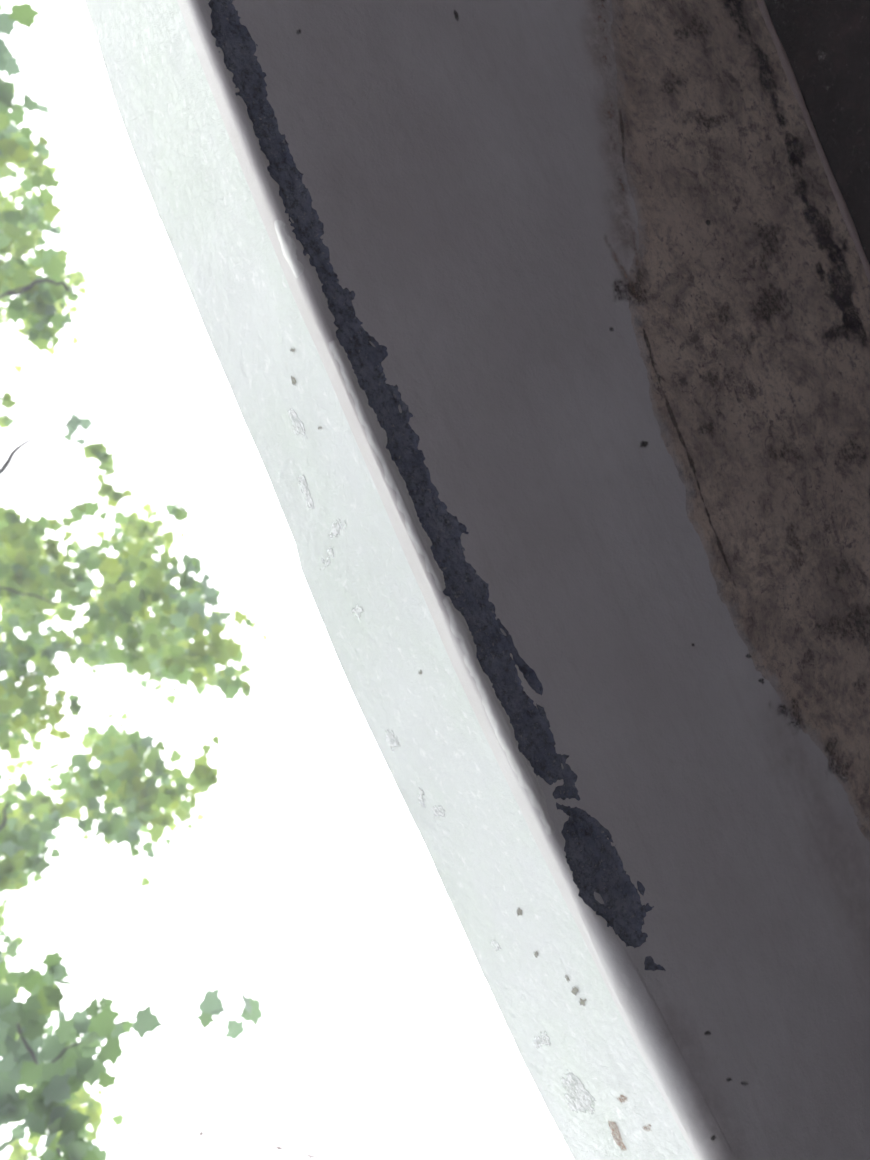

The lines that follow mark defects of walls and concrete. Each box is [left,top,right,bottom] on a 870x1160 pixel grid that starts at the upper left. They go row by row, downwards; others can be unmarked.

spalling [208,0,666,971]